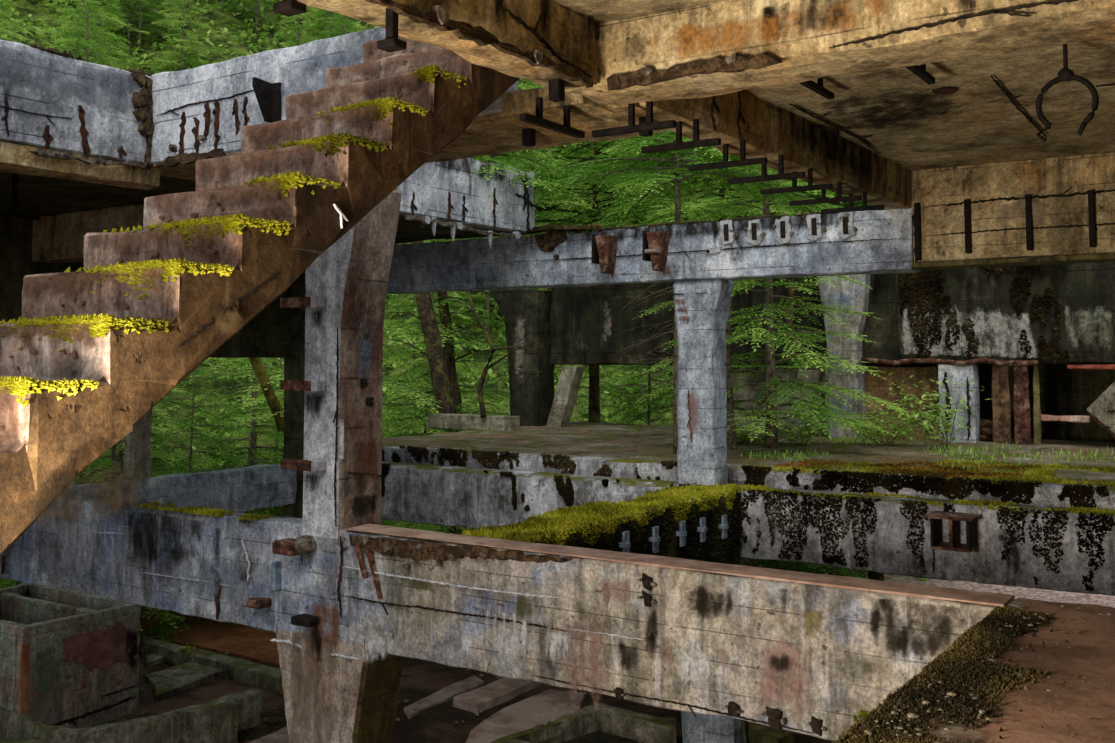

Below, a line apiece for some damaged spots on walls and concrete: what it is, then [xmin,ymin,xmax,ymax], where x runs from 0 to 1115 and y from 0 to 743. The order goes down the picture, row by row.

spalling [365,0,783,91]
crack [829,0,1078,48]
peeling [24,38,454,310]
spalling [405,215,568,259]
damp [873,268,967,299]
damp [1011,264,1111,346]
peeling [0,324,91,360]
damp [903,307,1037,358]
damp [999,535,1019,570]
peeling [61,621,140,688]